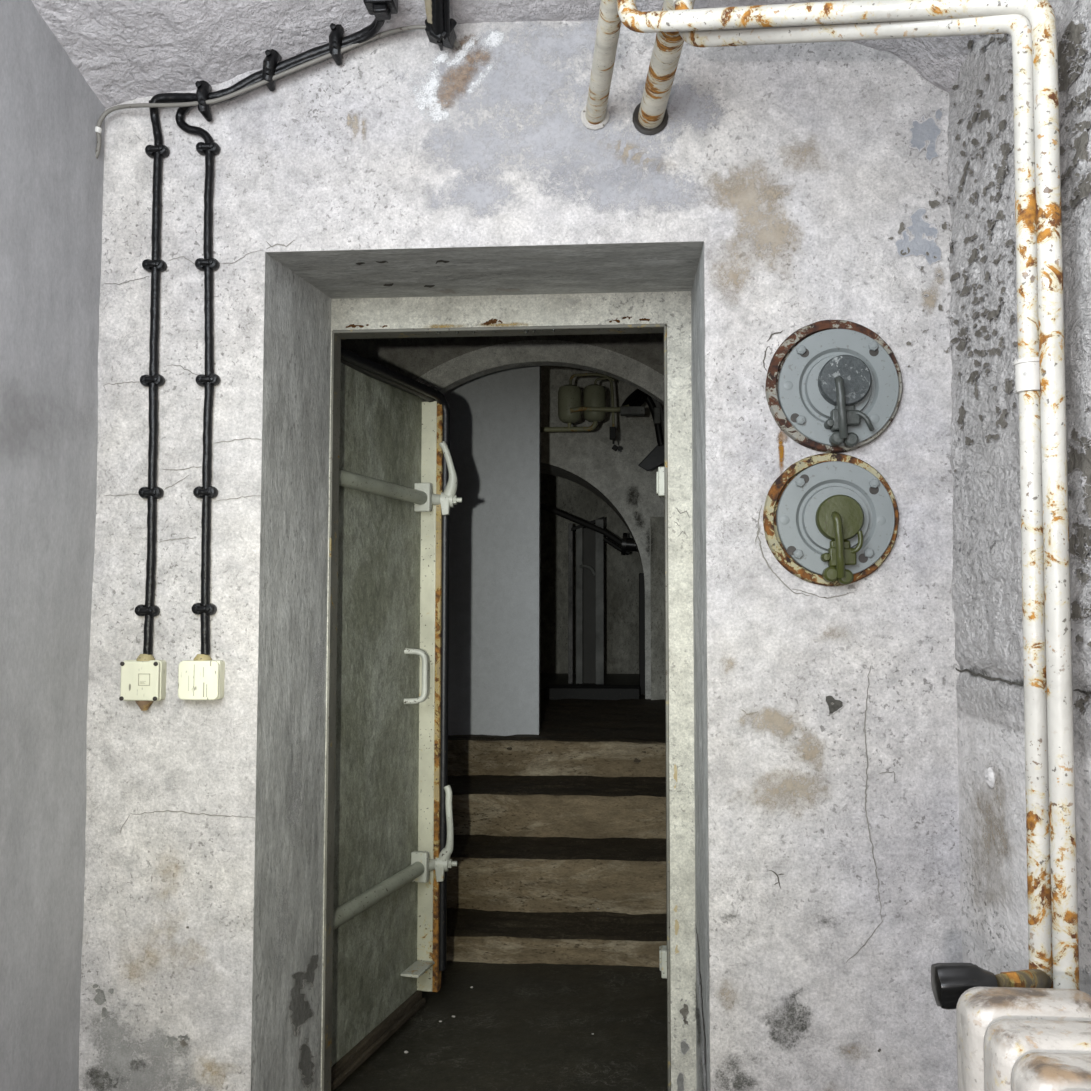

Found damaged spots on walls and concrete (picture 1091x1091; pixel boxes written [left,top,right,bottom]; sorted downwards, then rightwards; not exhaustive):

damp [413,21,722,216]
damp [714,166,796,288]
peeling [888,58,1018,446]
damp [741,709,821,764]
crack [956,668,1020,686]
crack [846,665,895,963]
damp [84,1014,210,1091]
crack [695,925,707,1091]
damp [719,1059,755,1091]
damp [768,993,810,1048]